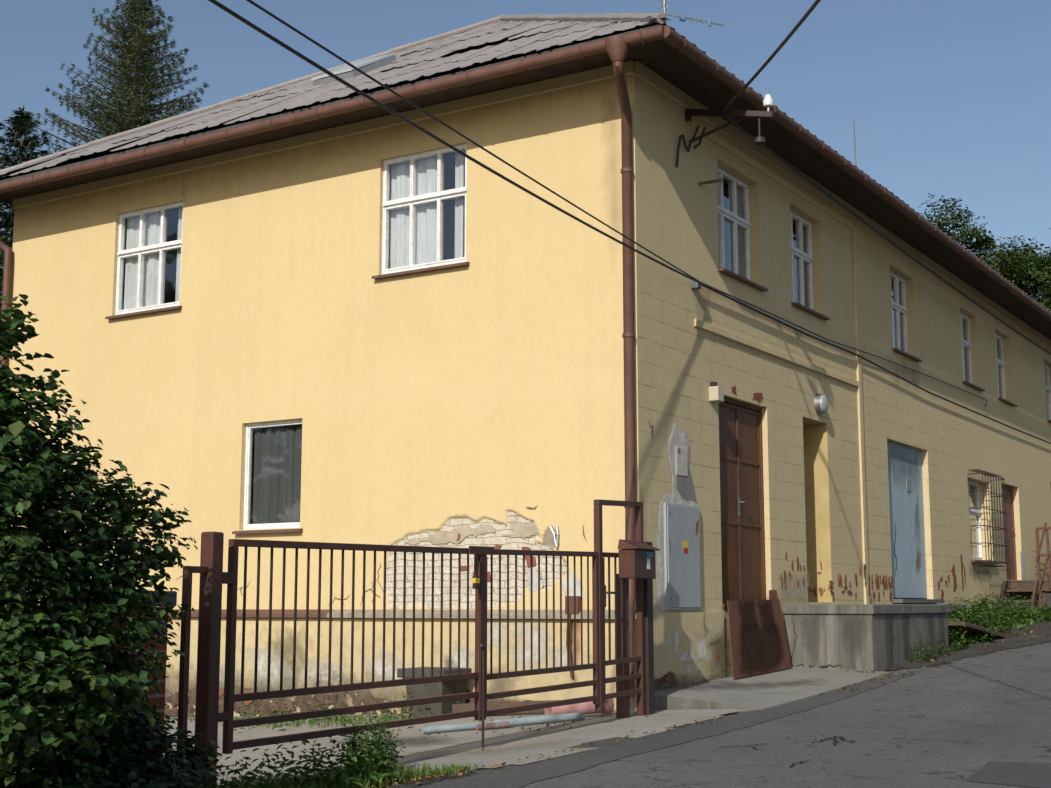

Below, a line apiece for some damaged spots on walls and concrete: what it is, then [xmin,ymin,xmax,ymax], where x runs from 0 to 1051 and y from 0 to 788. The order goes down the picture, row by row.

spalling [386,505,584,609]
peeling [769,552,894,601]
peeling [938,554,966,599]